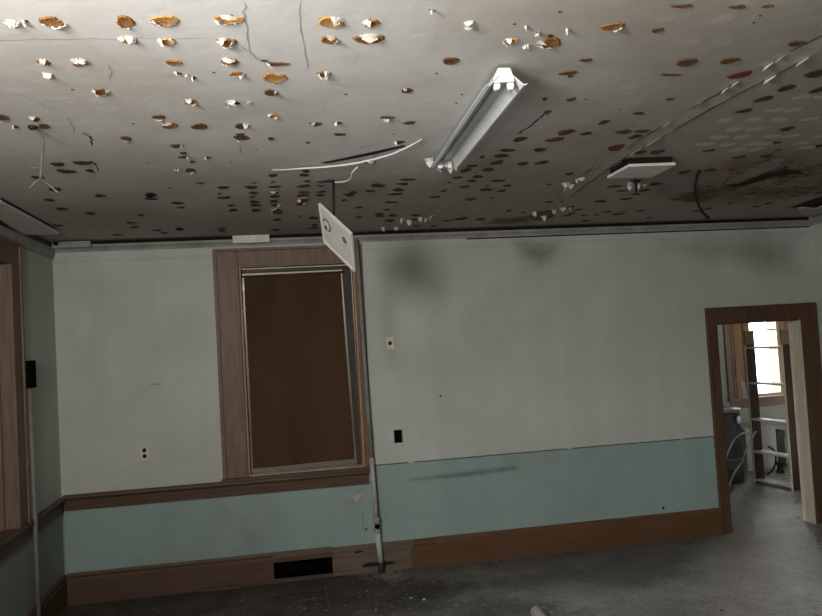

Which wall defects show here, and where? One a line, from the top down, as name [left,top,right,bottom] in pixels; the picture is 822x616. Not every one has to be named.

peeling [3,19,28,28]
peeling [117,25,137,44]
peeling [213,15,237,25]
crack [242,1,259,60]
crack [299,2,309,69]
peeling [326,16,346,41]
peeling [358,19,381,43]
peeling [502,25,551,50]
peeling [216,37,236,66]
water stain [676,156,822,201]
peeling [729,158,784,182]